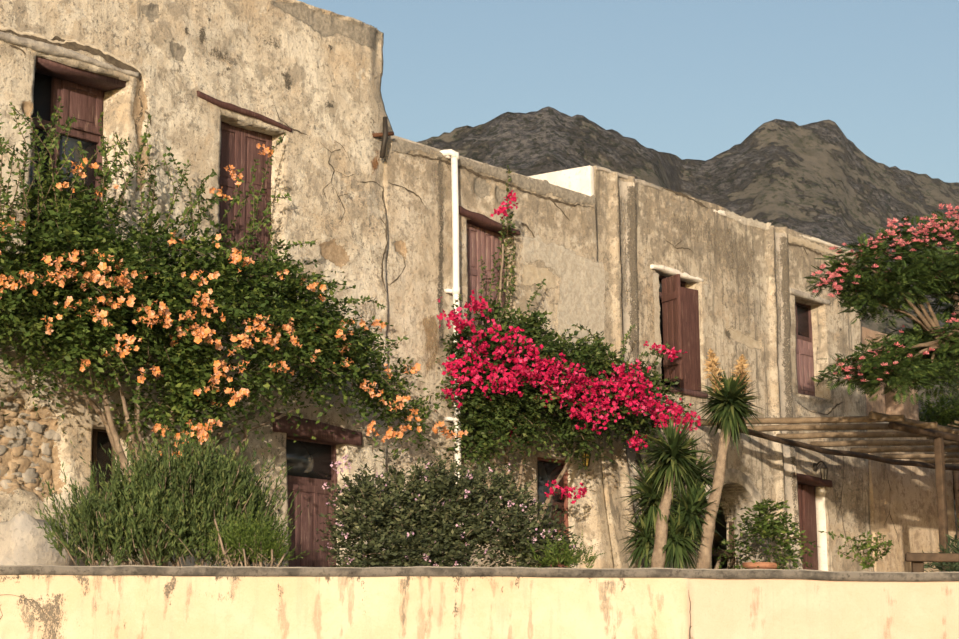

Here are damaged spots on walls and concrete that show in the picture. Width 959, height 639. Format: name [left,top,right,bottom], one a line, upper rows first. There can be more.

crack [275,107,424,292]
peeling [0,395,66,502]
water stain [18,594,67,639]